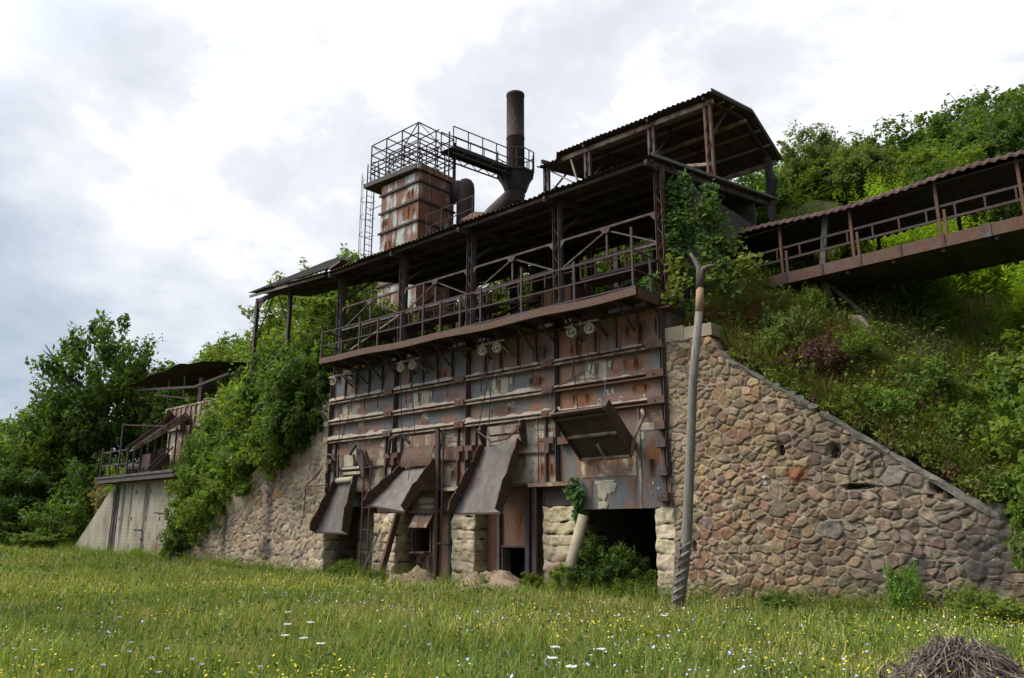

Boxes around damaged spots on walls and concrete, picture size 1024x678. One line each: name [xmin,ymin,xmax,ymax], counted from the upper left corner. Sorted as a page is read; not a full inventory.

peeling [589,479,617,509]